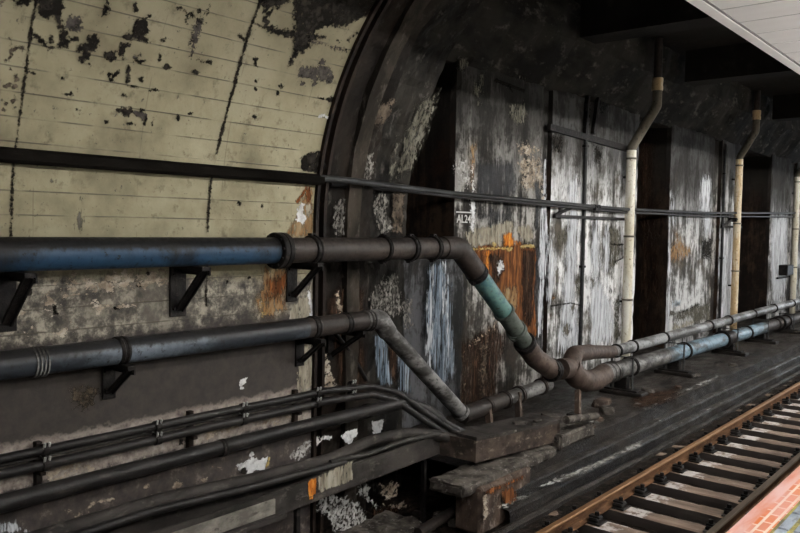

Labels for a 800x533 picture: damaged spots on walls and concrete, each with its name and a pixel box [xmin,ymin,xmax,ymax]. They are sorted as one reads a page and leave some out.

crack [9,0,42,237]
peeling [2,0,154,126]
crack [215,1,273,155]
peeling [258,0,377,87]
leakage [389,93,439,183]
crack [205,178,213,232]
corrosion [255,266,287,317]
leakage [425,259,506,405]
corrosion [476,231,537,337]
leakage [533,159,580,353]
leakage [699,175,733,318]
peeling [236,452,271,474]